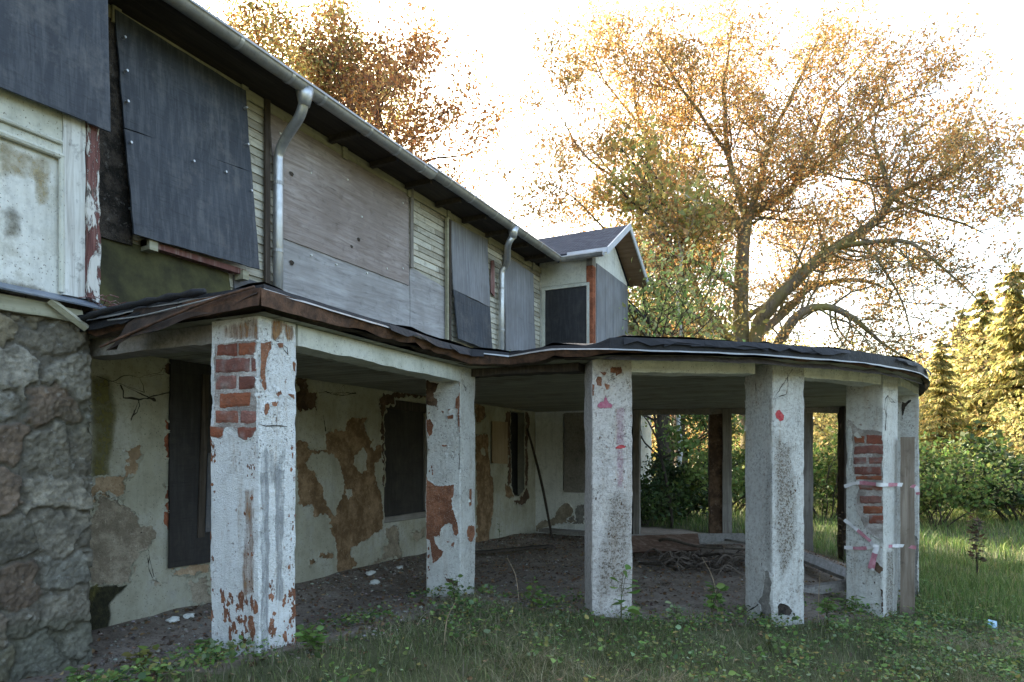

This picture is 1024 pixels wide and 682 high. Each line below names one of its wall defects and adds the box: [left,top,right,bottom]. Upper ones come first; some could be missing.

damp [92,377,115,477]
damp [89,584,127,630]
flaking render [89,443,169,587]
crack [97,372,168,420]
peeling [167,556,296,653]
flaking render [210,337,319,463]
damp [261,453,284,652]
flaking render [288,379,530,590]
flaking render [535,498,597,532]
flaking render [846,418,884,543]